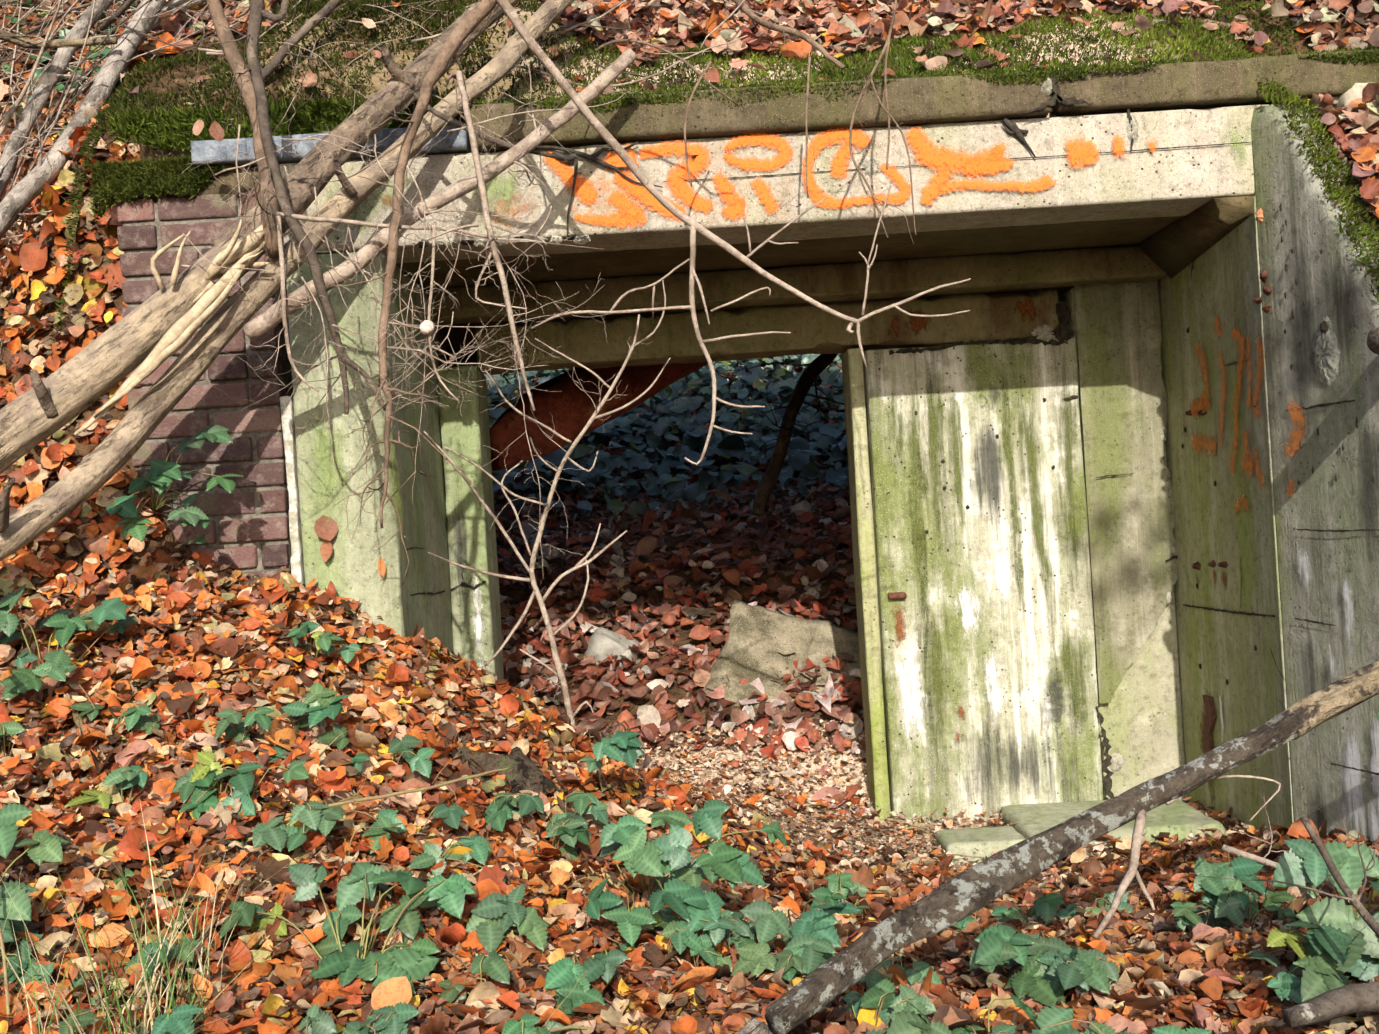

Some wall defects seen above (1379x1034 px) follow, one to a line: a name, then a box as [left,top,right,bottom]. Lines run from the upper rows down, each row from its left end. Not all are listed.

water stain [316,428,346,495]
water stain [1059,397,1081,561]
water stain [456,518,483,649]
corrosion [895,609,906,648]
water stain [892,381,1052,744]
corrosion [1191,560,1229,586]
water stain [978,634,1086,791]
corrosion [1200,696,1224,754]